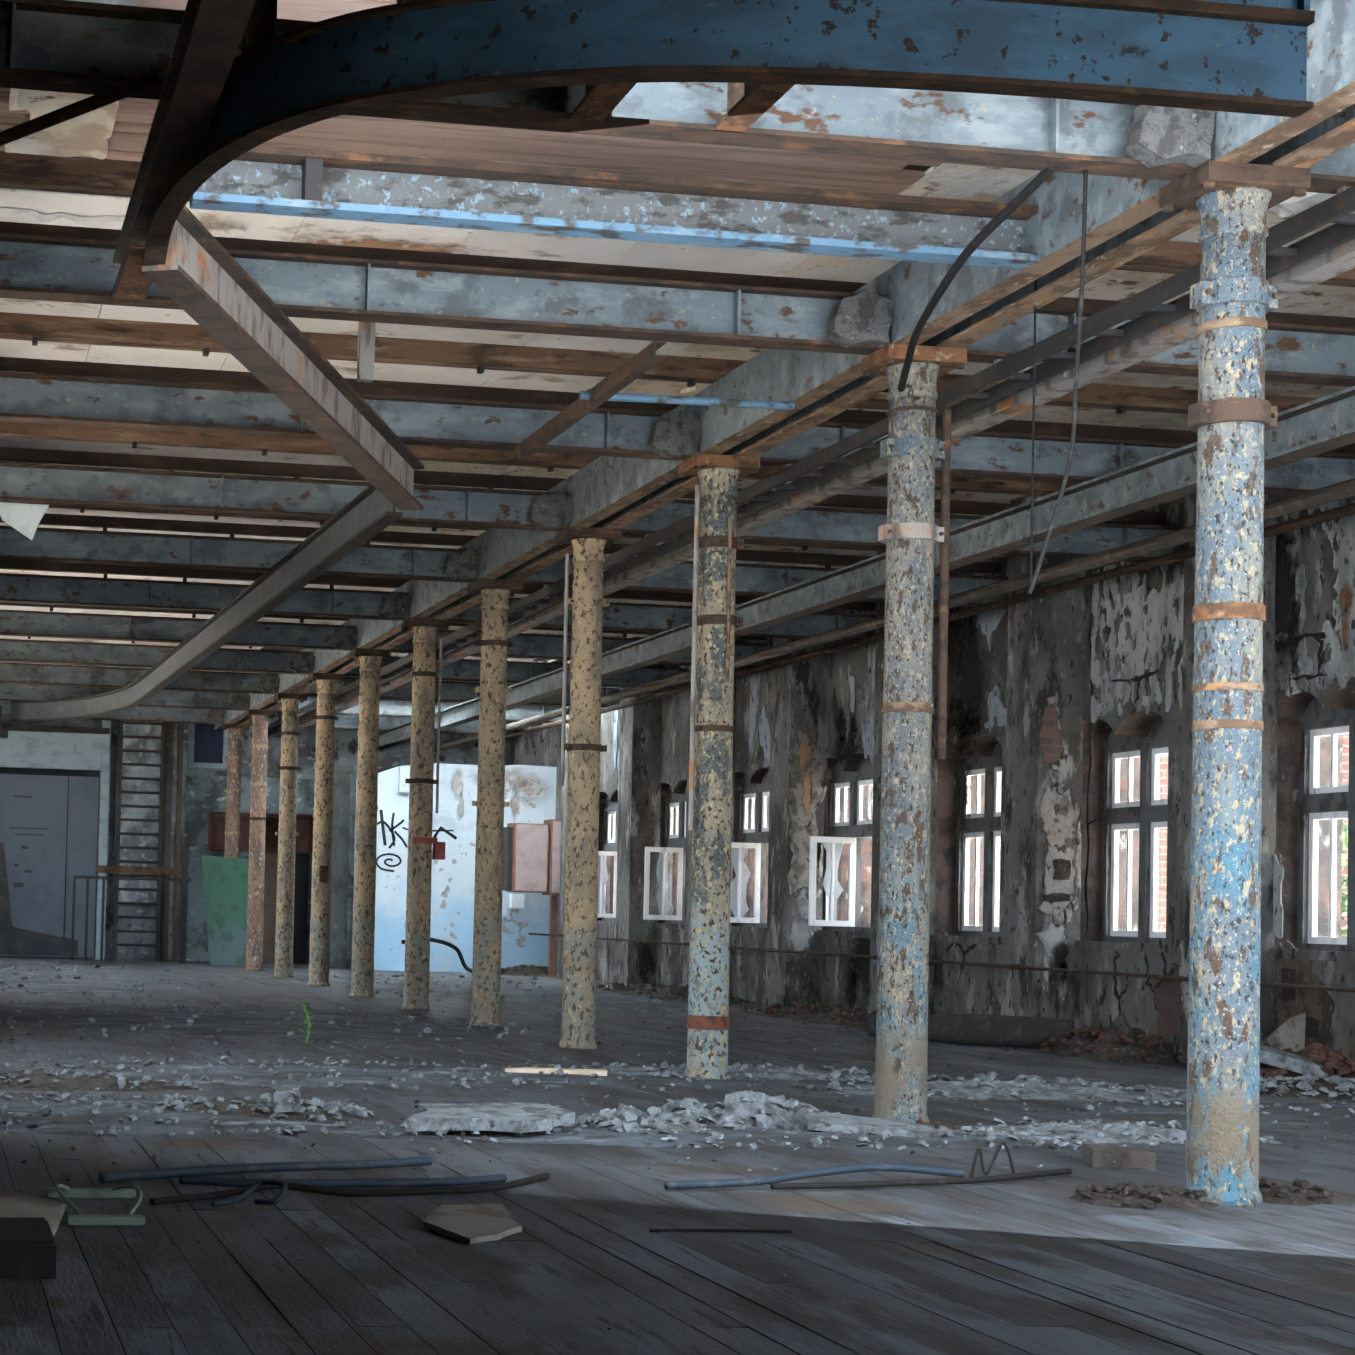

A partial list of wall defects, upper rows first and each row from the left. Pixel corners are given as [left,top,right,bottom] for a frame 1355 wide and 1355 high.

peeling [1091,561,1184,723]
peeling [1276,499,1355,697]
spalling [1038,692,1081,927]